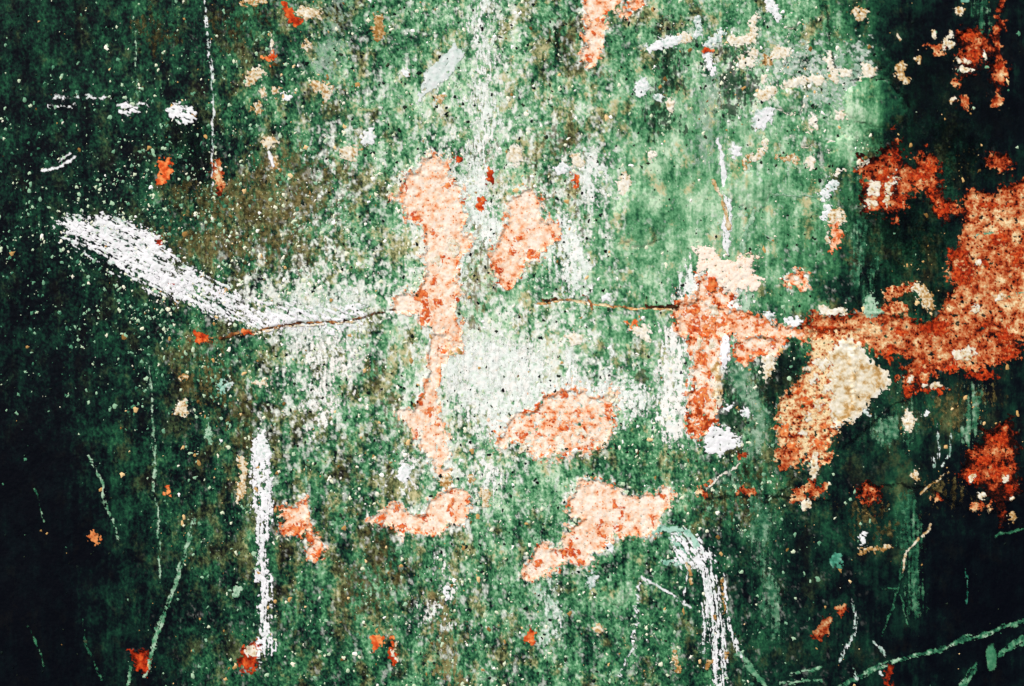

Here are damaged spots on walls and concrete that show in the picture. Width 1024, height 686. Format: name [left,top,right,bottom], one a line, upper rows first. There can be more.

peeling [491,0,880,262]
rust [922,0,1012,112]
crack [207,308,395,342]
peeling [385,253,621,628]
crack [537,294,680,311]
rust [670,126,1024,528]